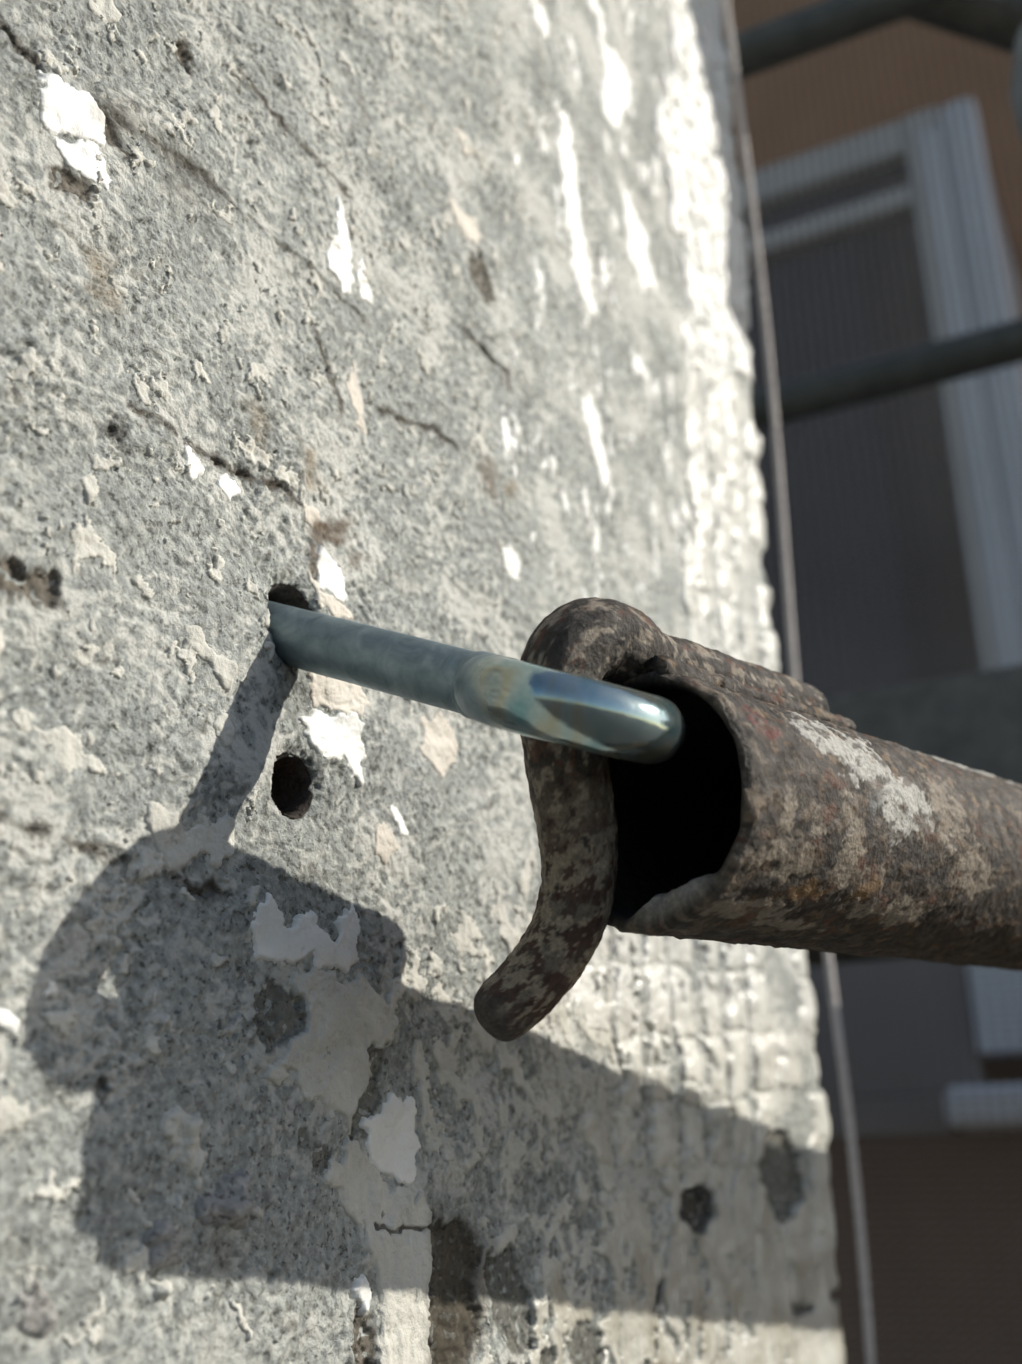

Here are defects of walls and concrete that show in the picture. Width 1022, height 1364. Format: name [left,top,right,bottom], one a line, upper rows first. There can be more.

crack [0,22,39,65]
peeling [0,44,112,230]
crack [99,108,134,159]
peeling [127,92,249,178]
crack [238,68,351,198]
crack [315,330,343,413]
crack [467,331,511,391]
crack [378,407,460,451]
peeling [0,424,155,613]
peeling [298,671,370,788]
peeling [239,848,633,1364]
peeling [27,1169,85,1218]